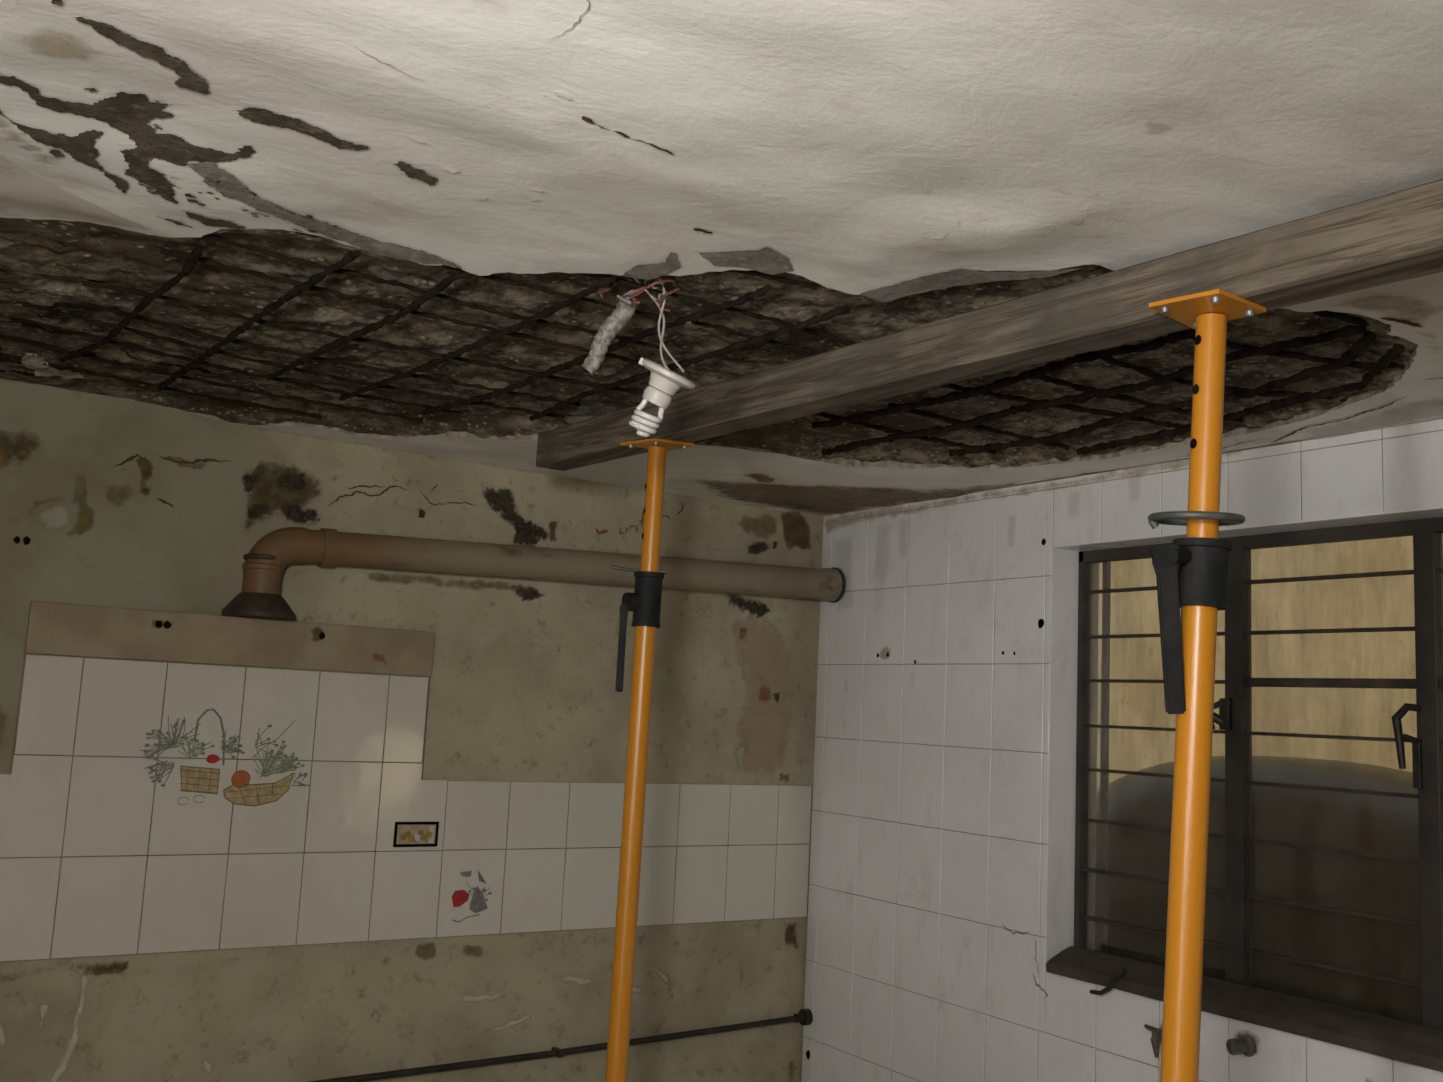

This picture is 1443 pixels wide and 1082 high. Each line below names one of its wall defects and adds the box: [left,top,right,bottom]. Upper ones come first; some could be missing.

flaking render [74,17,211,95]
crack [552,0,590,38]
crack [582,116,674,155]
spalling [0,76,1114,439]
spalling [690,328,1195,468]
spalling [1223,308,1416,434]
peeling [242,463,319,527]